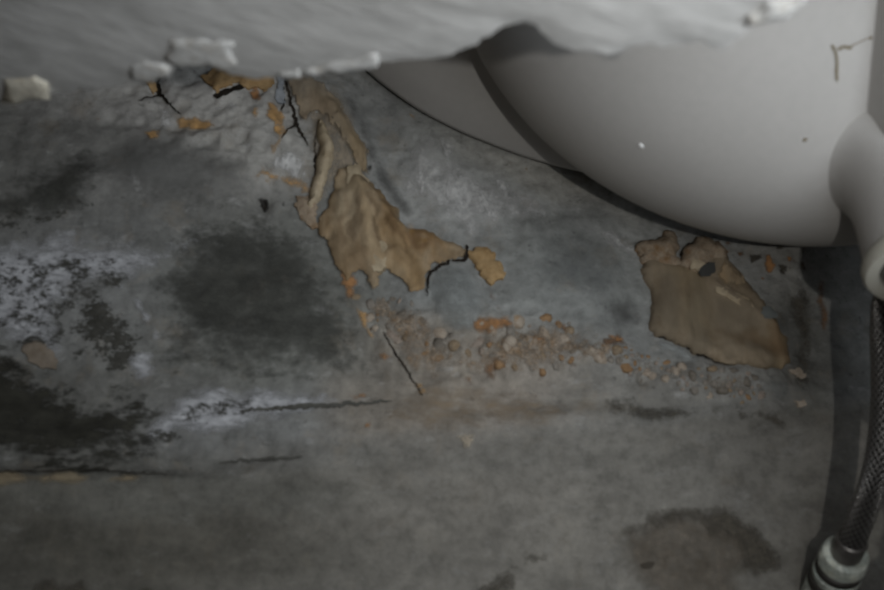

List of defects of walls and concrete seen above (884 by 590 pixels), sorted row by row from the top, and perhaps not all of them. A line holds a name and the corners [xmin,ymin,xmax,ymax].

crack [138,78,182,115]
crack [281,79,317,179]
peeling [130,38,806,404]
crack [426,244,469,296]
damp [0,226,390,473]
crack [383,331,423,395]
damp [632,510,779,590]